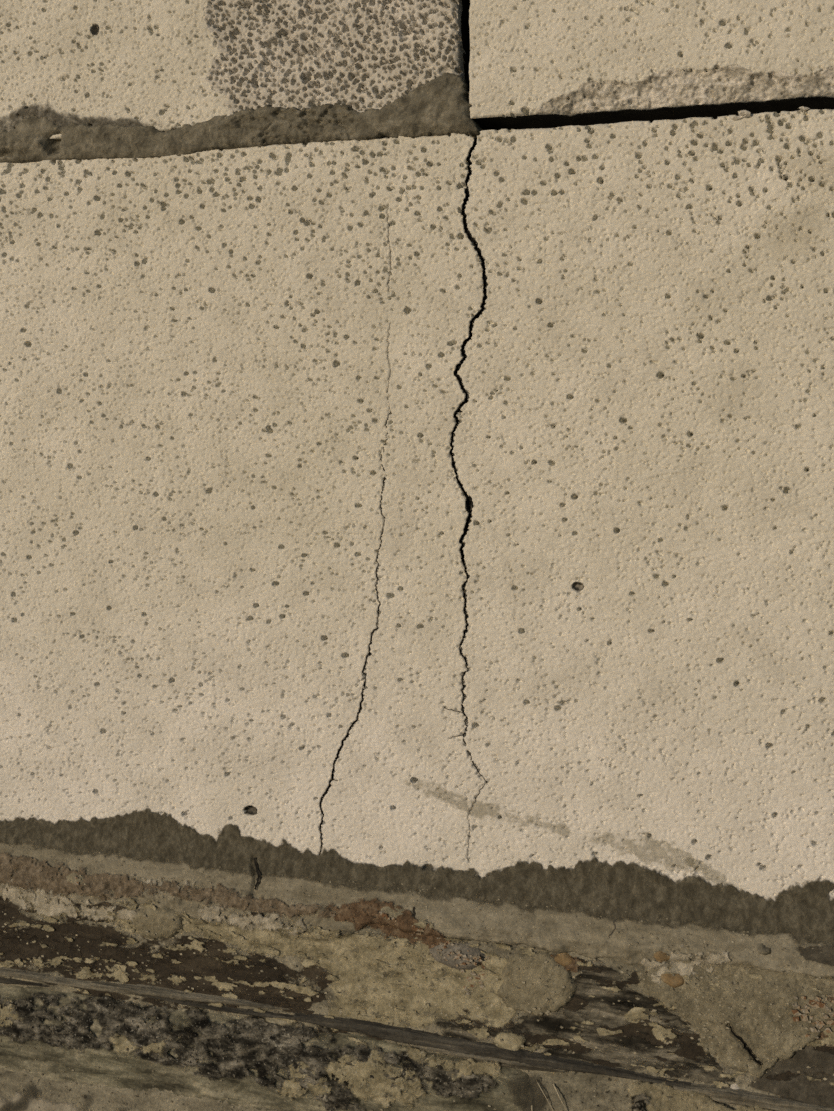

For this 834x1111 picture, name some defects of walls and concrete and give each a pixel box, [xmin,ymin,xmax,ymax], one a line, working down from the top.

crack [384,208,392,291]
crack [444,138,487,861]
crack [319,323,391,855]
rust [326,898,454,949]
water stain [0,808,834,966]
water stain [70,986,236,1013]
water stain [174,936,313,1014]
water stain [522,1033,621,1073]
water stain [562,996,589,1012]
water stain [573,945,730,991]
water stain [600,997,708,1069]
water stain [750,1035,834,1109]